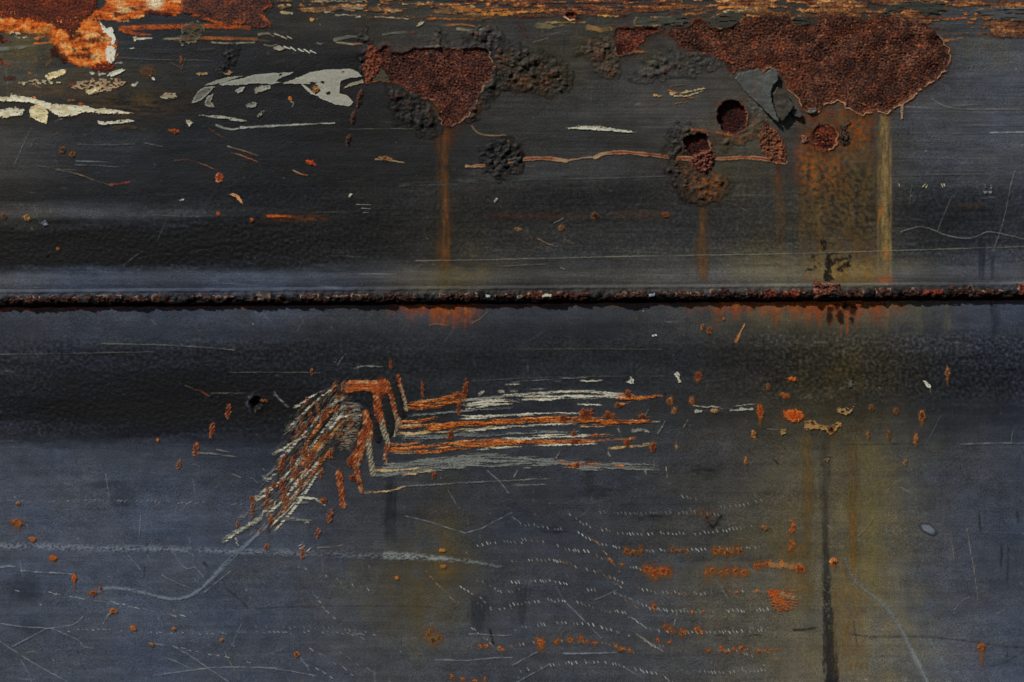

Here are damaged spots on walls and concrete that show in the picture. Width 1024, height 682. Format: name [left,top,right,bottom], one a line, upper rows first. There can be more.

rust [0,0,182,72]
peeling [0,69,134,125]
peeling [186,72,271,127]
peeling [735,67,817,123]
rust [276,0,1024,320]
rust [6,294,162,309]
rust [391,379,677,454]
rust [250,381,352,550]
rust [608,547,671,580]
rust [704,520,805,577]
rust [755,589,798,611]
damp [823,566,838,682]